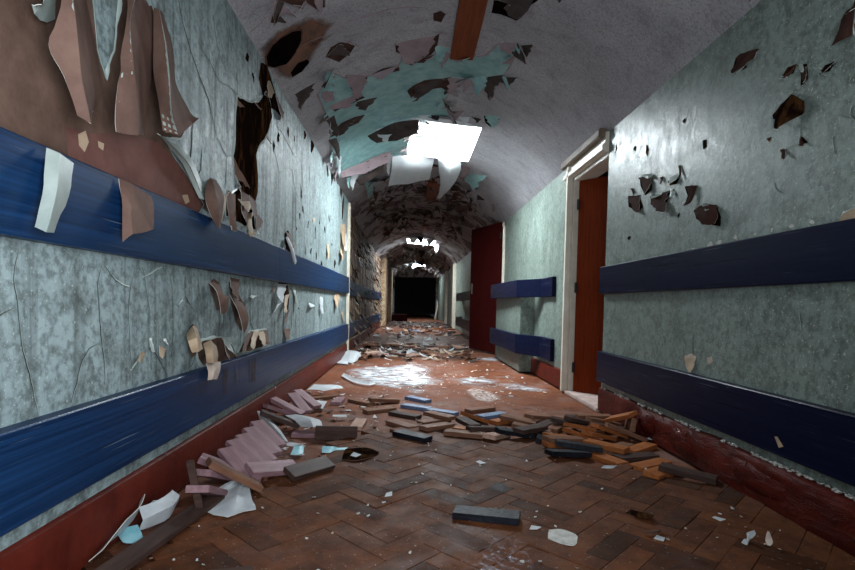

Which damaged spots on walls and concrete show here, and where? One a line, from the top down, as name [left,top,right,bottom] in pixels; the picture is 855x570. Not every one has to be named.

peeling [0,0,326,242]
peeling [433,11,446,22]
peeling [491,0,538,21]
peeling [730,49,760,73]
peeling [767,61,836,159]
peeling [832,1,855,46]
peeling [283,34,533,348]
peeling [628,165,721,226]
crack [0,243,39,412]
crack [71,262,202,405]
peeling [186,277,270,380]
peeling [271,282,299,341]